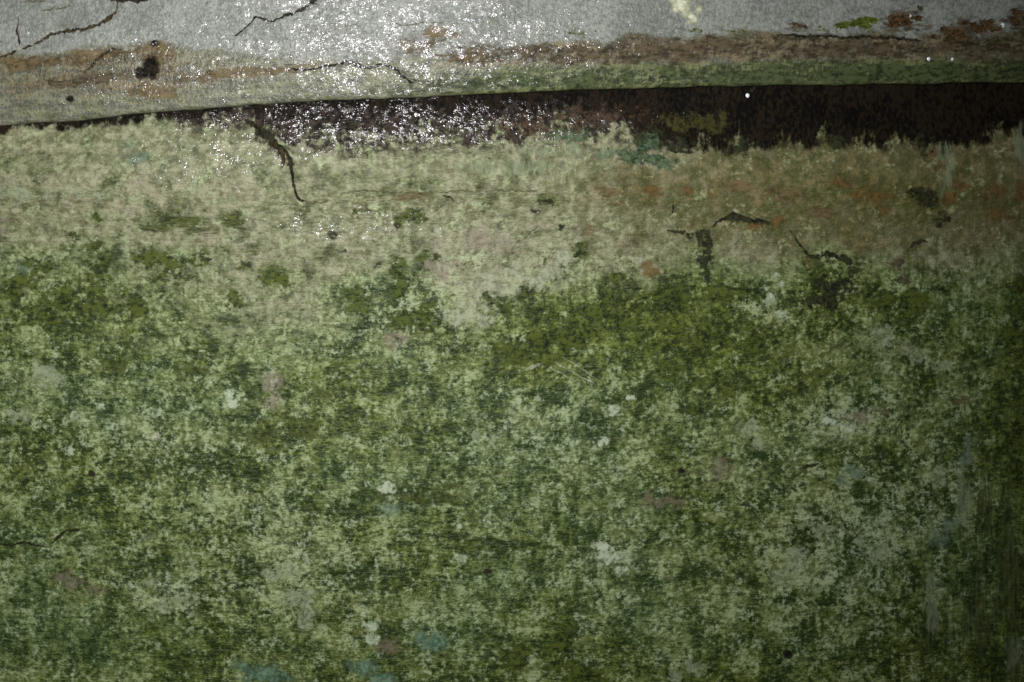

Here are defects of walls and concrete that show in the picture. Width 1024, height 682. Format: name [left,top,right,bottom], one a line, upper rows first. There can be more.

crack [0,0,147,58]
crack [235,0,317,36]
rust [401,7,1024,66]
crack [286,60,442,86]
water stain [0,60,1024,159]
crack [246,120,538,204]
crack [667,205,852,268]